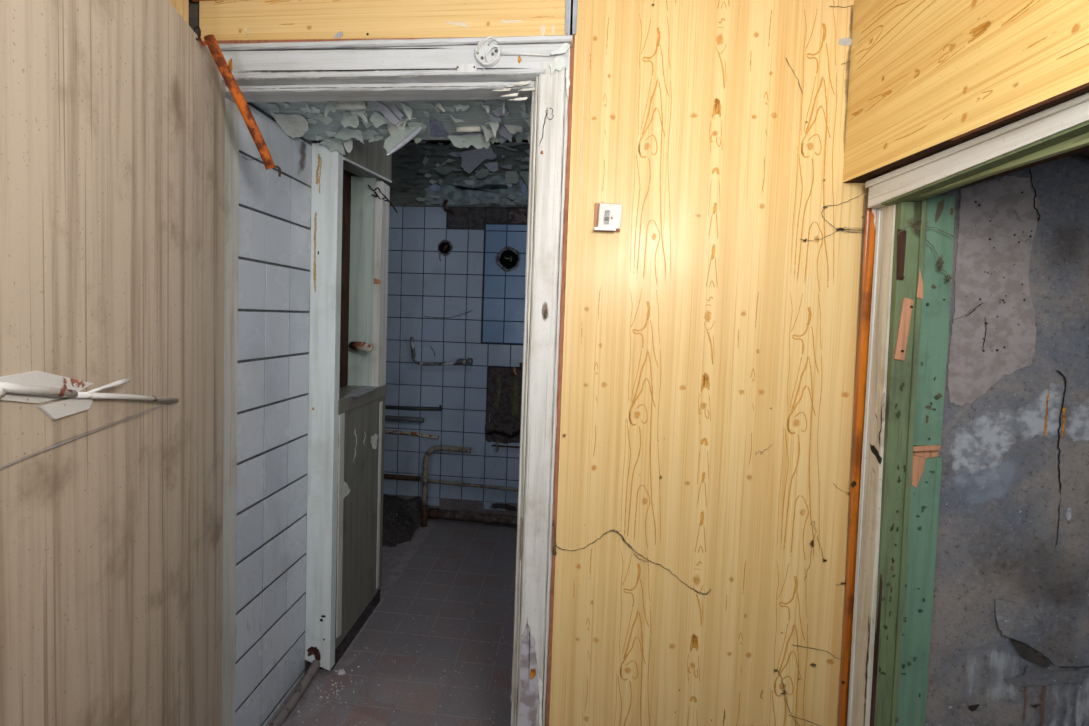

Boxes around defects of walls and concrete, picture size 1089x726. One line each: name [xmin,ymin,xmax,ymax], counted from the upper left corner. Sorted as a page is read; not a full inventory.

peeling [550,42,570,97]
peeling [267,81,535,261]
crack [1055,370,1067,547]
peeling [519,616,543,726]
leakage [989,652,1016,697]
spalling [994,599,1089,686]